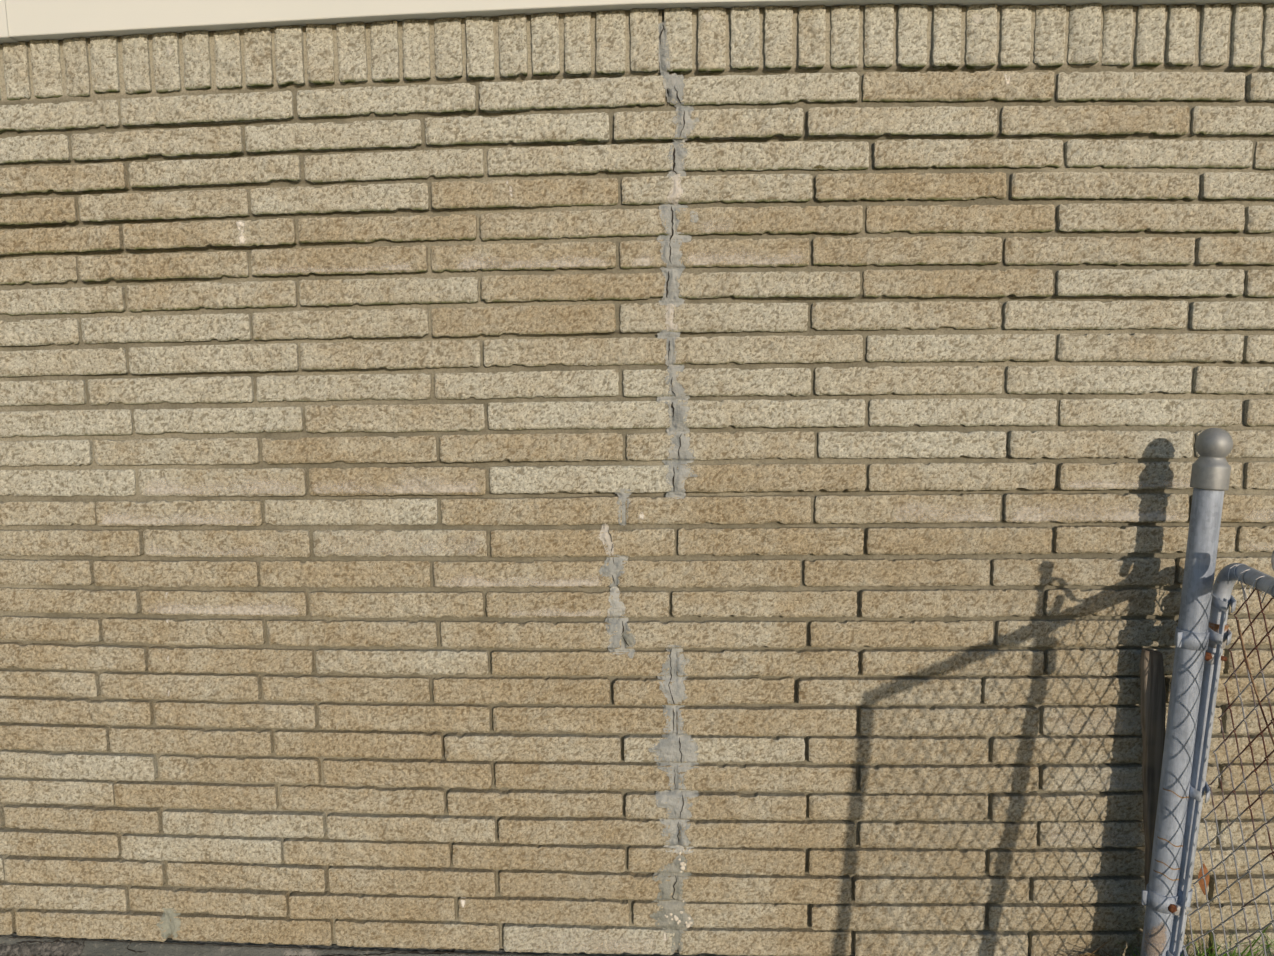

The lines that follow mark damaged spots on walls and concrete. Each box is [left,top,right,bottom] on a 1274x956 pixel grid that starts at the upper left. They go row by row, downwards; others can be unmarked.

crack [656,12,699,499]
crack [599,488,699,954]